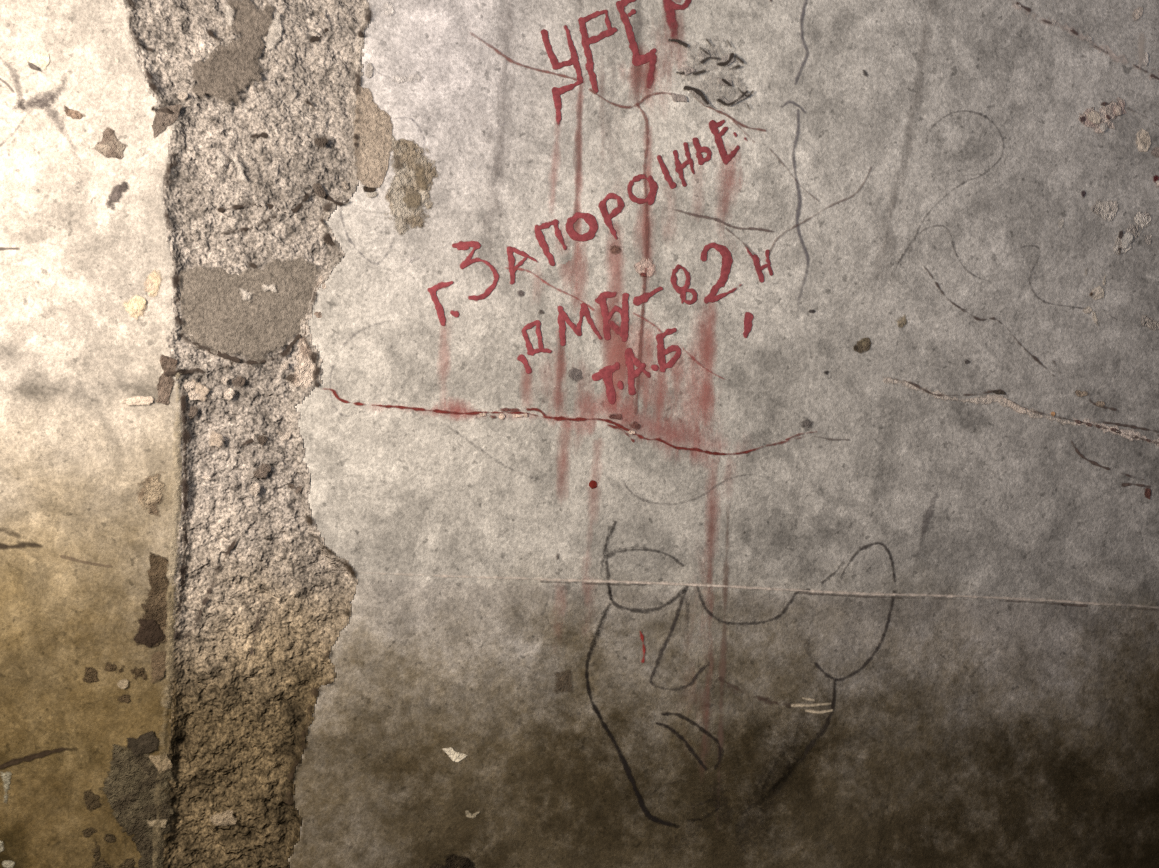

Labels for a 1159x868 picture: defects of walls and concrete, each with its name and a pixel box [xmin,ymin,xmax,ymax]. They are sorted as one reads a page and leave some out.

crack [1015,2,1159,79]
crack [330,44,800,455]
crack [925,268,995,320]
spalling [82,0,437,868]
crack [884,377,1159,499]
damp [555,670,572,692]